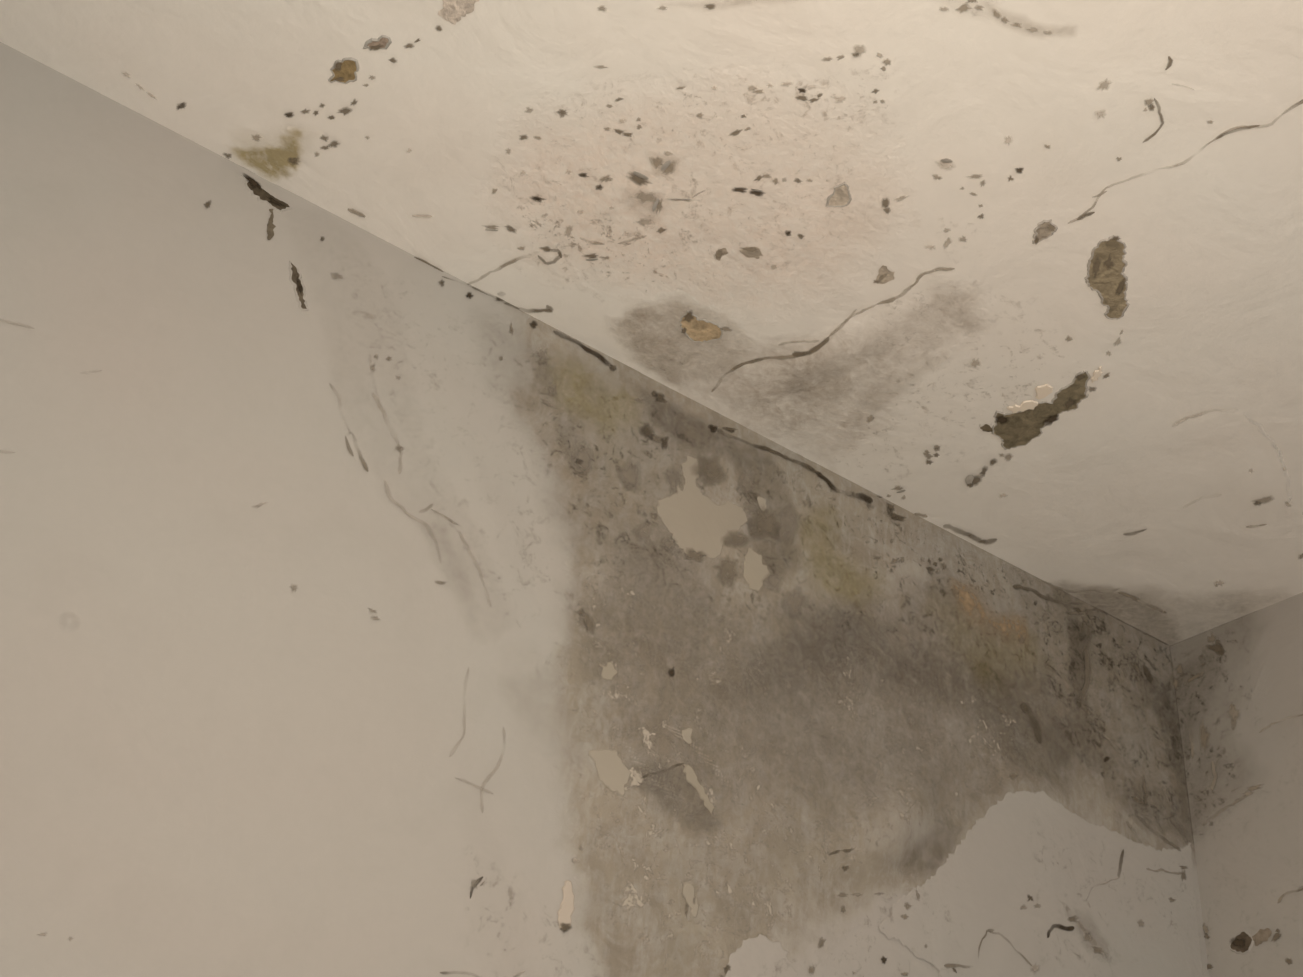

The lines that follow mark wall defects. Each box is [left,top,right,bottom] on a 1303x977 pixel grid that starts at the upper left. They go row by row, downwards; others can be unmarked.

spalling [436,0,479,31]
spalling [328,35,420,87]
peeling [285,100,357,119]
crack [1143,56,1173,142]
crack [1208,125,1260,144]
crack [1077,189,1107,220]
crack [860,268,955,313]
crack [712,335,831,392]
spalling [965,235,1130,487]
peeling [657,456,748,559]
water stain [470,63,1230,977]
peeling [743,548,771,591]